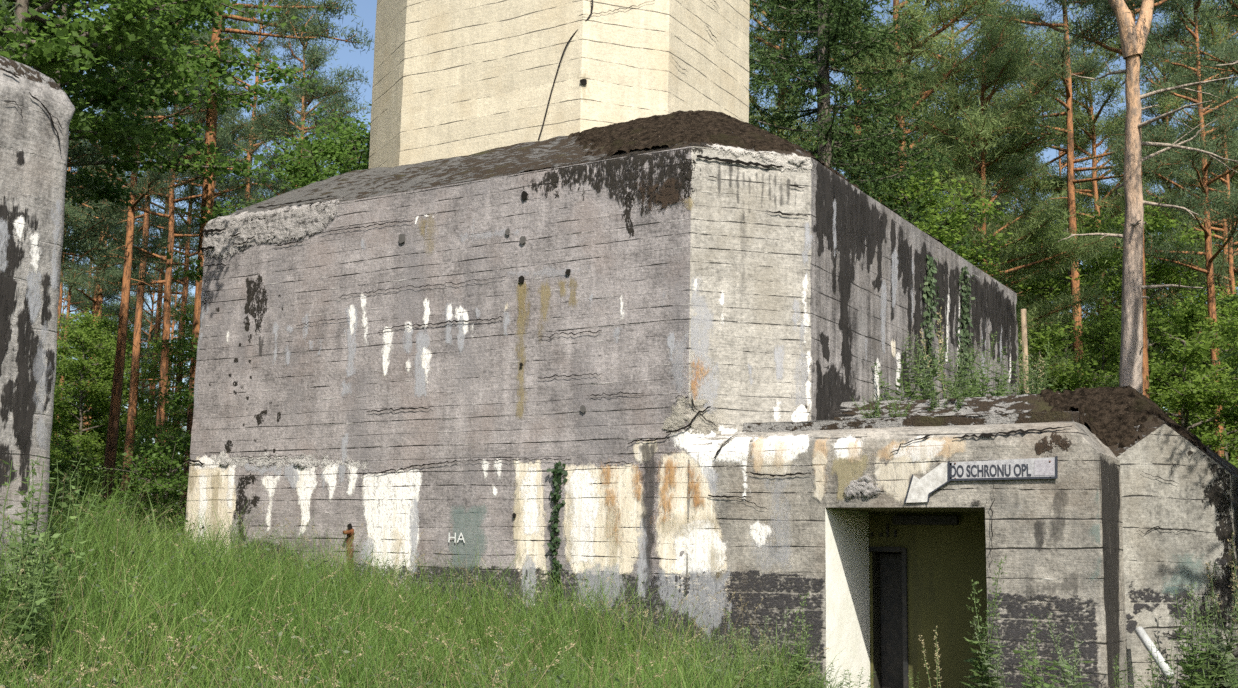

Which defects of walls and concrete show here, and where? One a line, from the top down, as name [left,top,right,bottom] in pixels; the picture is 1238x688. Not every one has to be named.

water stain [517,142,707,237]
water stain [0,196,61,493]
water stain [184,272,358,565]
crack [604,395,737,464]
crack [708,472,811,509]
water stain [670,160,1018,501]
spalling [844,475,880,498]
water stain [1186,450,1238,627]